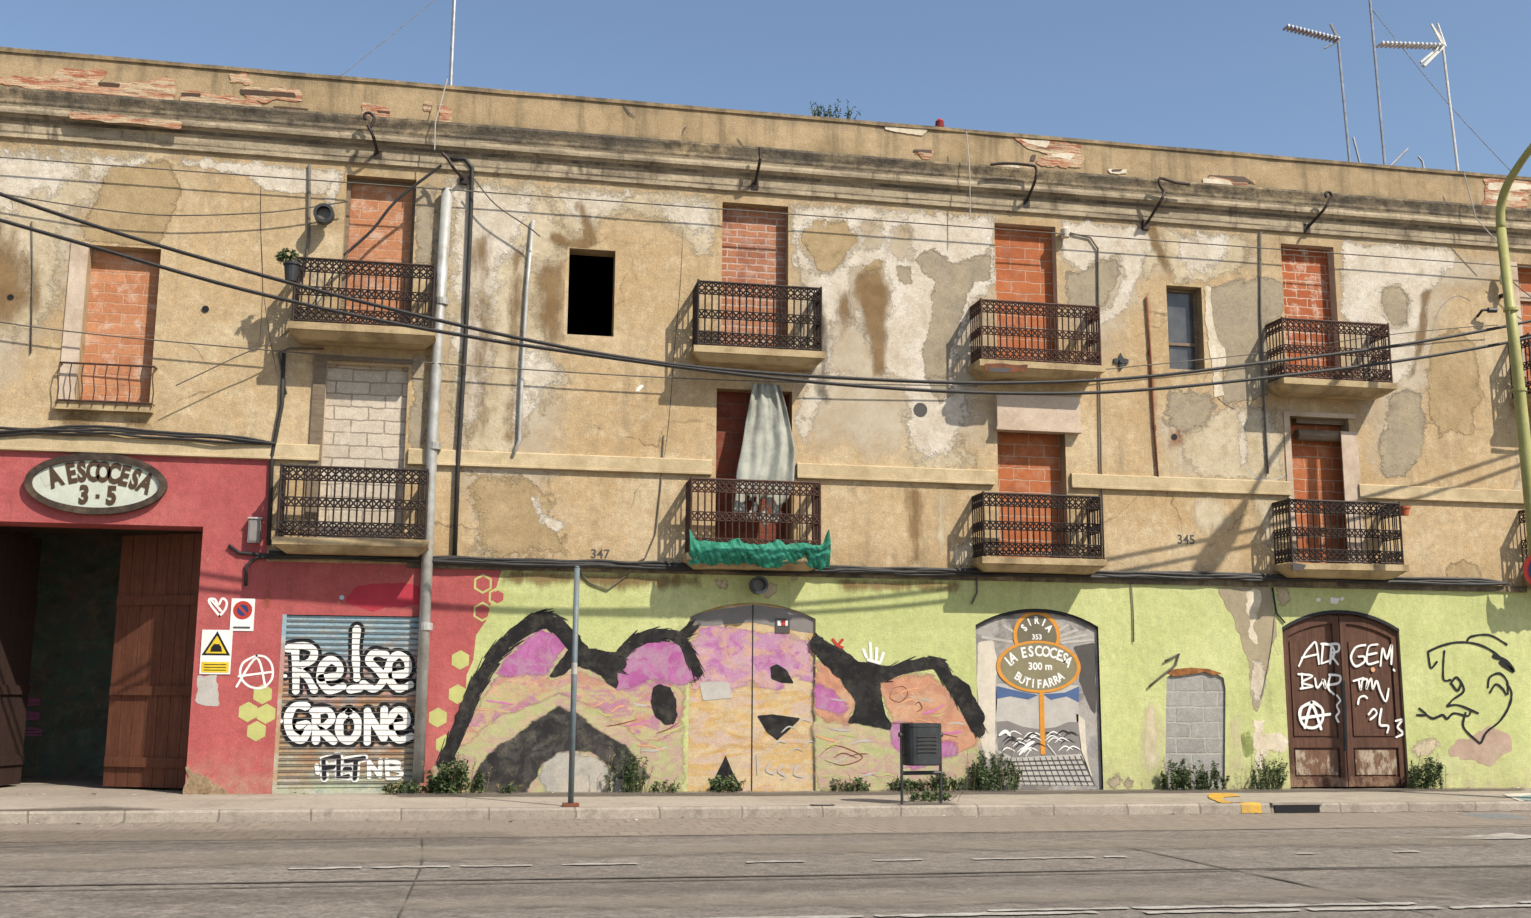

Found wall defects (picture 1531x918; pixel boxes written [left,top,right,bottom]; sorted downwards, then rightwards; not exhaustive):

flaking render [68,112,182,129]
flaking render [0,67,308,111]
peeling [0,143,345,344]
peeling [408,174,720,452]
leakage [797,218,916,453]
peeling [790,202,1000,469]
leakage [947,294,991,439]
peeling [1060,219,1287,481]
peeling [1339,238,1485,478]
flaking render [1482,177,1531,208]
peeling [465,471,570,558]
peeling [1218,586,1290,778]